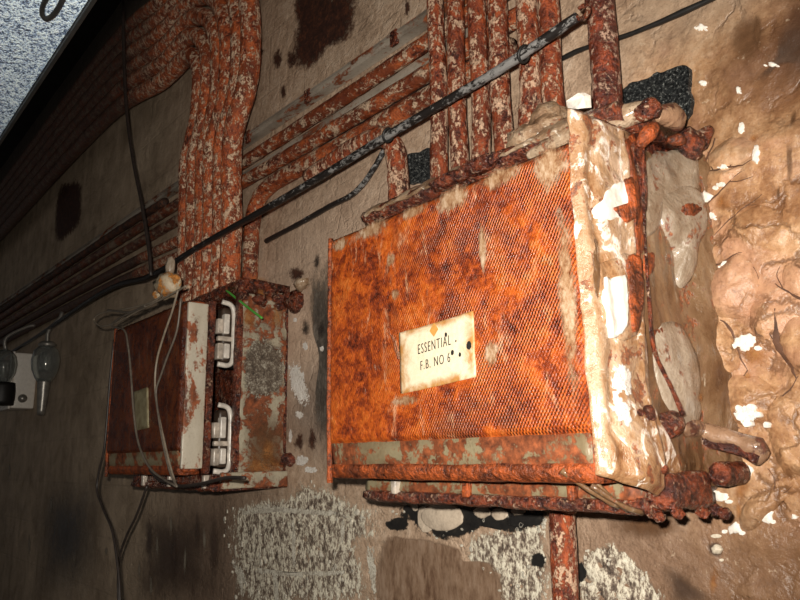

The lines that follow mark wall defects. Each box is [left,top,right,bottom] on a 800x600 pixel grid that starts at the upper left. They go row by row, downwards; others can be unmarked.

water stain [274,0,355,69]
water stain [736,22,760,50]
water stain [386,505,424,531]
water stain [427,505,547,540]
water stain [531,553,546,568]
water stain [578,563,587,582]